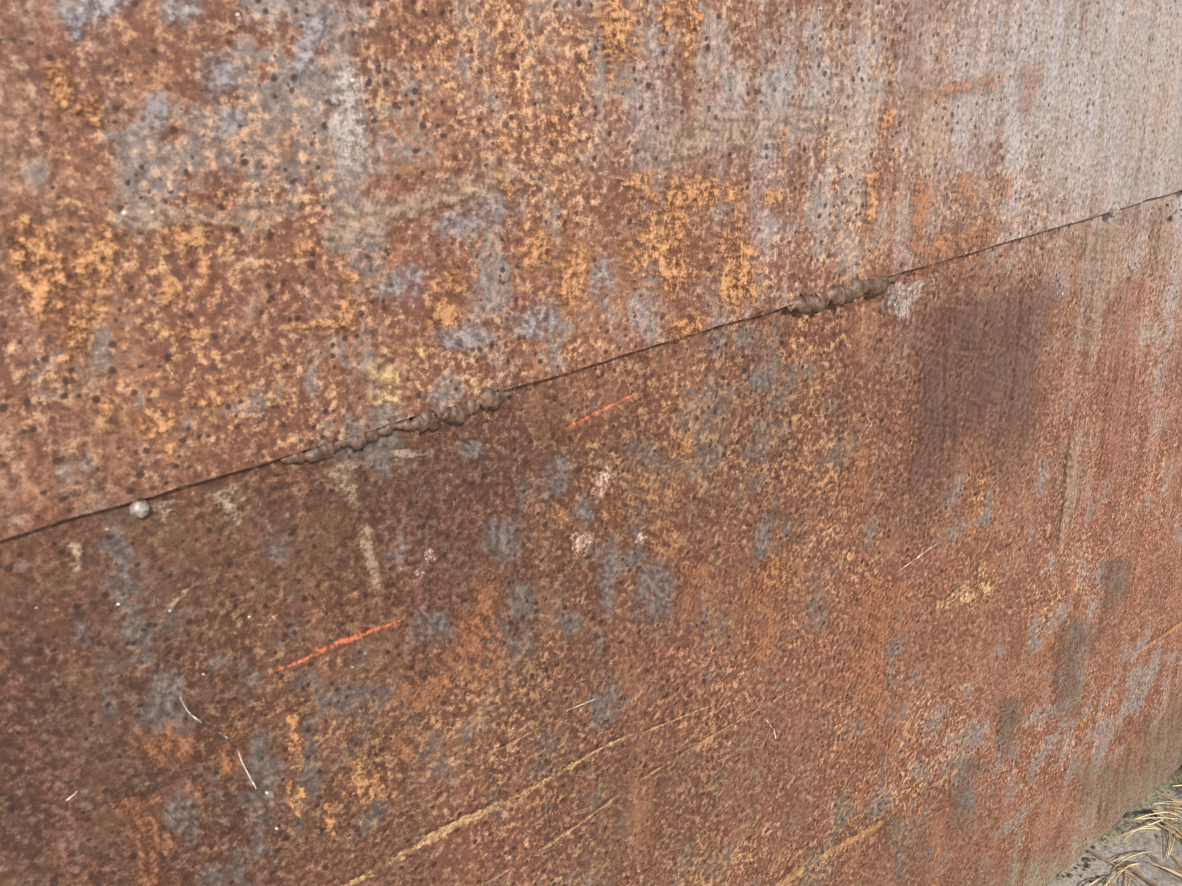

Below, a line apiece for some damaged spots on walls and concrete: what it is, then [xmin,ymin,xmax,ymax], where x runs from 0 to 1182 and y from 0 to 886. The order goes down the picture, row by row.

rust [600,0,643,87]
rust [9,214,123,361]
rust [164,213,212,289]
rust [284,271,380,330]
rust [429,269,475,330]
rust [521,228,587,311]
rust [620,170,761,312]
damp [1075,226,1121,349]
rust [130,404,176,462]
damp [1059,433,1092,544]
rust [286,712,305,817]
rust [349,757,385,804]